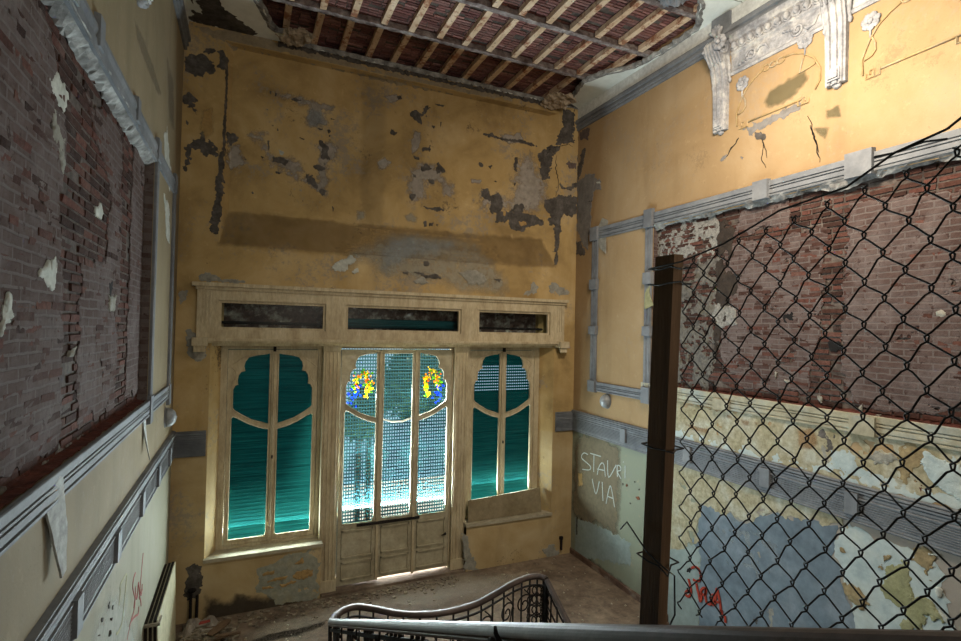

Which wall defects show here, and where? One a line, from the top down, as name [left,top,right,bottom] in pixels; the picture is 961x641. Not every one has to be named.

spalling [188,0,544,106]
peeling [182,48,338,234]
peeling [405,104,454,227]
crack [727,132,767,168]
crack [807,116,820,158]
flaking render [0,0,171,578]
spalling [644,148,961,429]
peeling [185,329,209,362]
peeling [675,401,961,510]
peeling [255,548,321,605]
peeling [667,464,955,630]